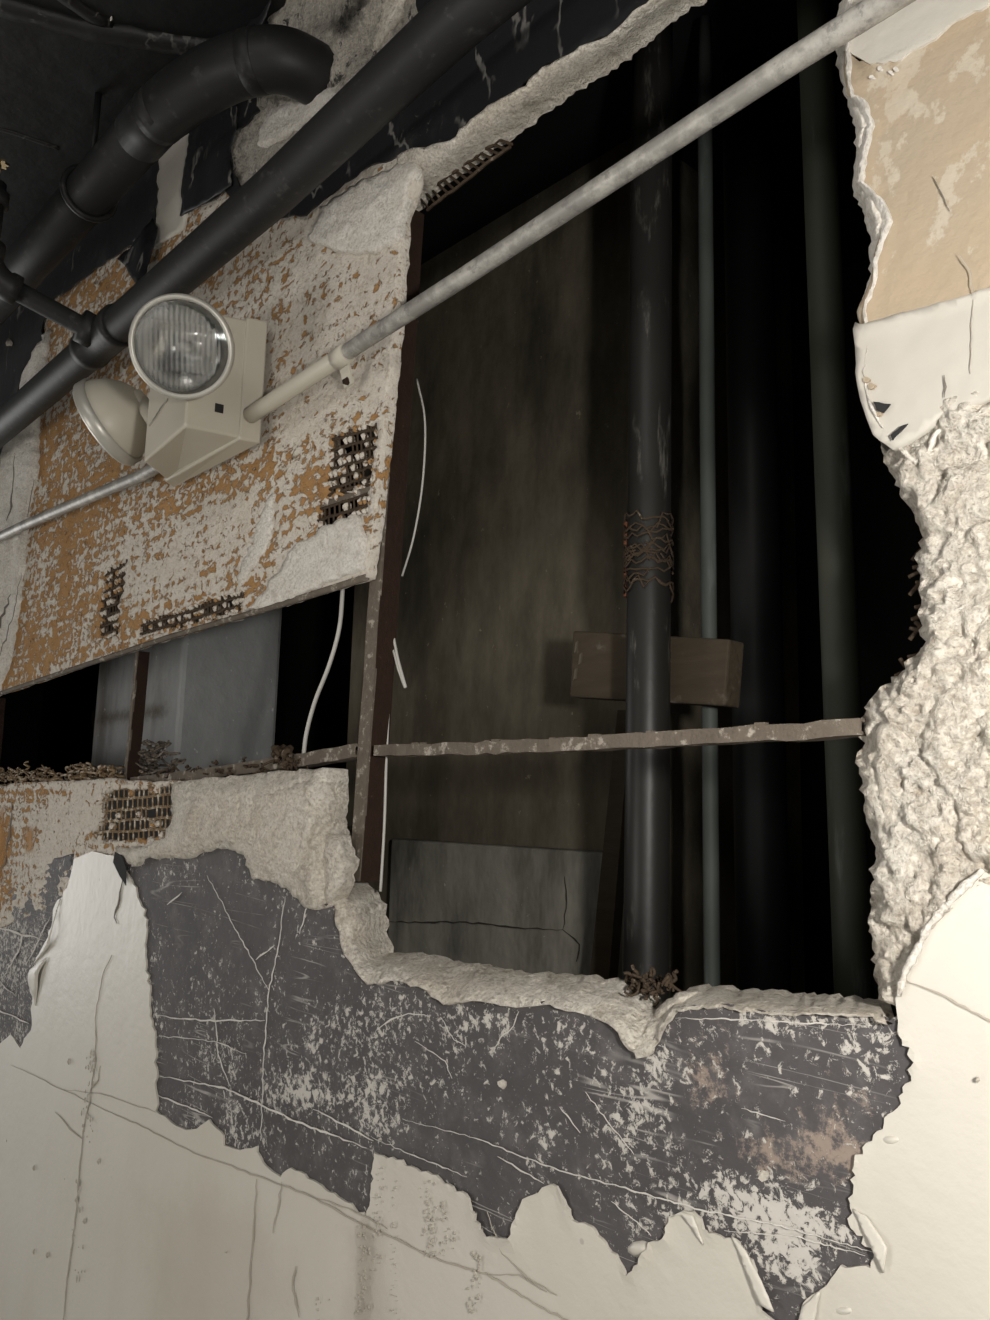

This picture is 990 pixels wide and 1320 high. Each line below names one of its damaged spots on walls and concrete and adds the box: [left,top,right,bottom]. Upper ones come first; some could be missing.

spalling [42,318,73,363]
spalling [2,326,405,695]
spalling [54,0,418,315]
spalling [189,0,707,397]
spalling [837,0,853,16]
spalling [835,6,990,1006]
crack [114,881,123,924]
crack [12,955,567,1320]
peeling [0,767,914,1320]
crack [389,877,580,962]